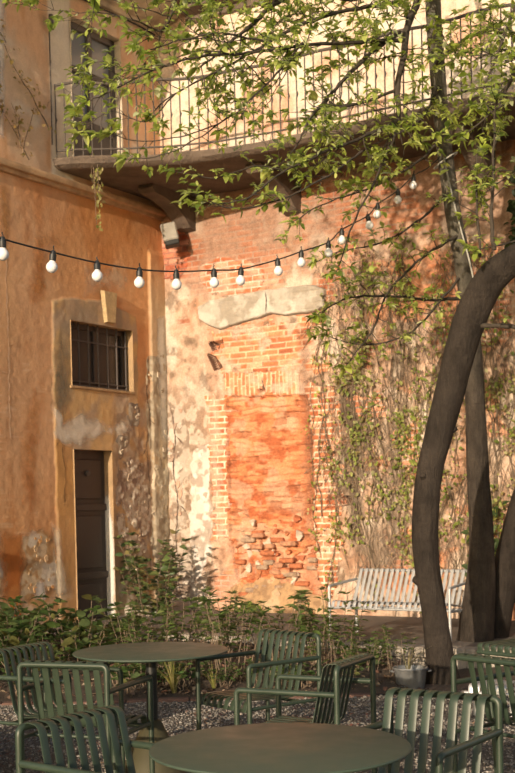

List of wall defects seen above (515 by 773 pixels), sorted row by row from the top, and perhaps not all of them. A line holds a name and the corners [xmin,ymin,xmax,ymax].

leakage [57,351,67,407]
spalling [55,315,389,616]
flaking render [392,418,421,469]
leakage [3,535,23,616]
flaking render [21,529,59,600]